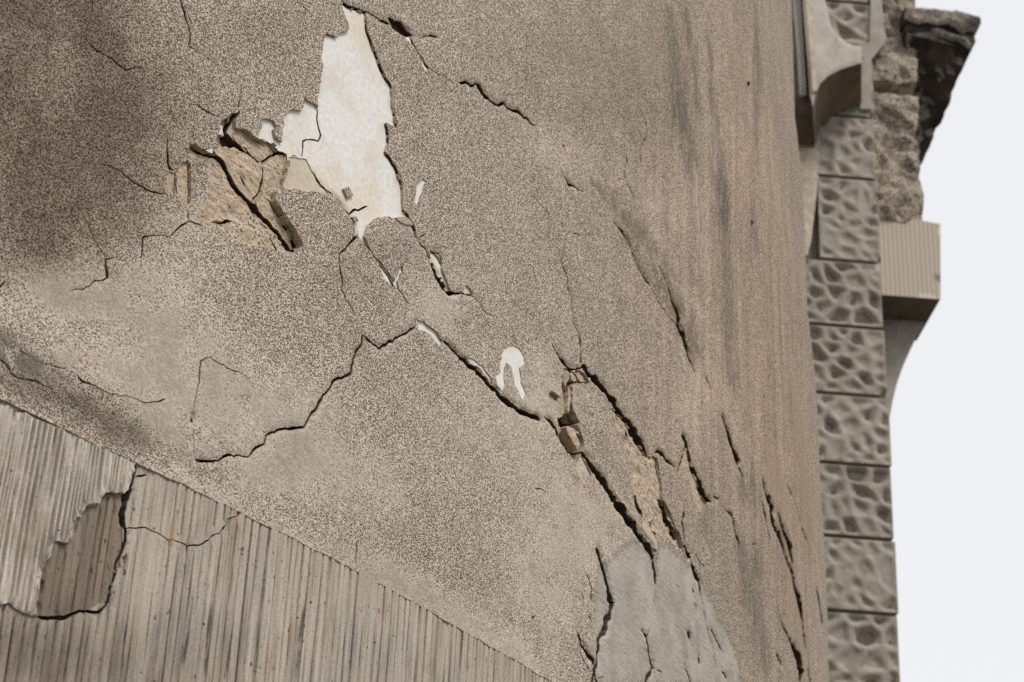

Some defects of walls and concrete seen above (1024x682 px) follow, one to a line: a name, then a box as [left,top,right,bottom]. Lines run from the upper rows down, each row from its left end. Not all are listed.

peeling [164,4,415,253]
crack [342,1,535,126]
crack [383,113,489,315]
spalling [36,493,122,616]
crack [37,466,236,621]
crack [195,327,414,463]
peeling [467,346,525,400]
crack [442,340,656,584]
spalling [548,369,590,484]
spalling [612,411,682,551]
crack [556,341,822,682]
spalling [683,453,705,511]